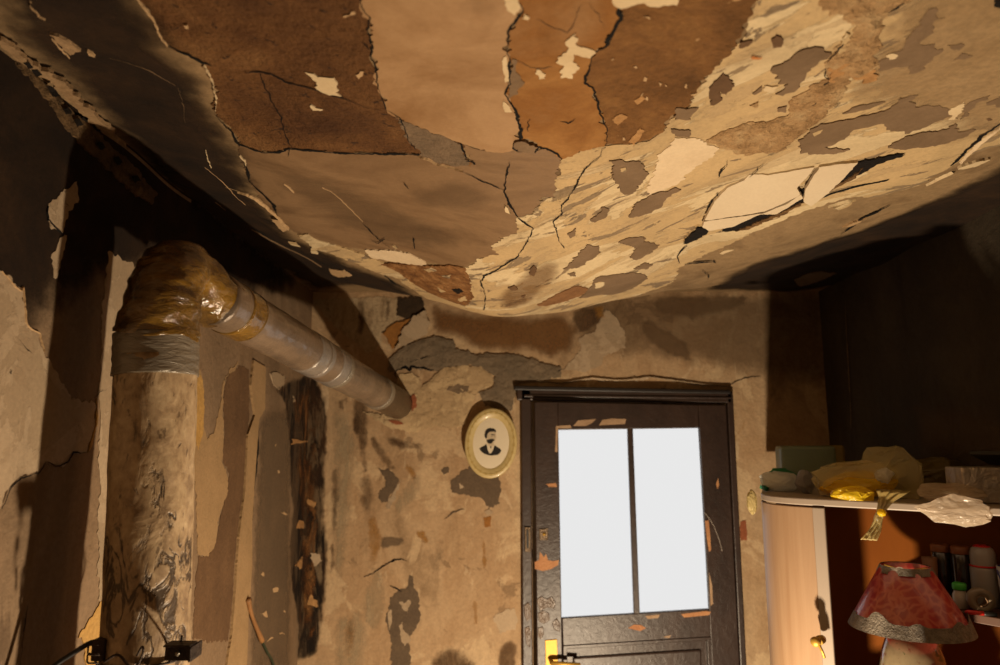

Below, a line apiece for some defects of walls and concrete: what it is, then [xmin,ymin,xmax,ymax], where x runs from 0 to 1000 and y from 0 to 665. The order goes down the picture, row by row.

peeling [46,182,79,279]
flaking render [140,0,472,167]
crack [137,0,623,310]
flaking render [609,0,1000,264]
crack [801,206,888,258]
crack [823,180,888,198]
crack [950,124,1000,167]
peeling [563,236,660,373]
peeling [0,251,135,665]
peeling [192,362,250,644]
peeling [441,466,501,527]
peeling [385,575,421,665]